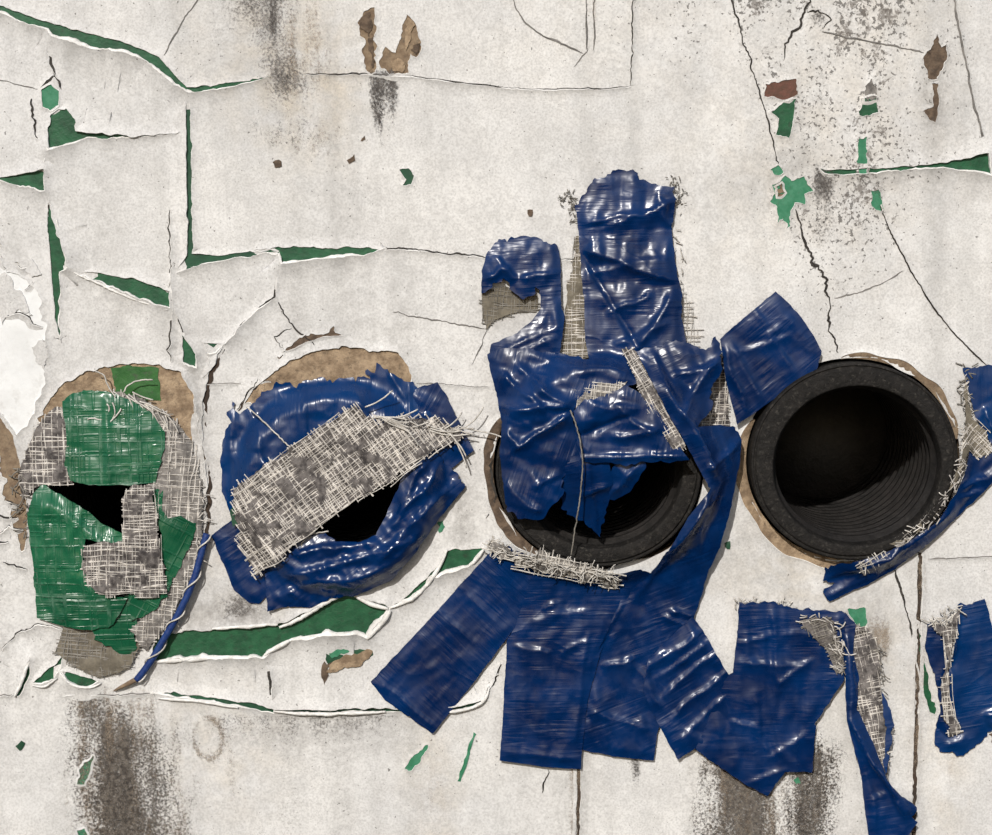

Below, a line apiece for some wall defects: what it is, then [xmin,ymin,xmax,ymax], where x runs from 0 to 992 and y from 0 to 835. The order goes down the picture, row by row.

damp [235,0,304,98]
crack [305,0,647,101]
crack [731,0,779,164]
crack [783,0,924,61]
damp [814,168,832,234]
peeling [759,73,992,235]
peeling [0,0,387,559]
crack [795,204,989,365]
peeling [240,320,424,407]
peeling [138,413,538,722]
damp [68,697,191,835]
damp [693,742,841,835]